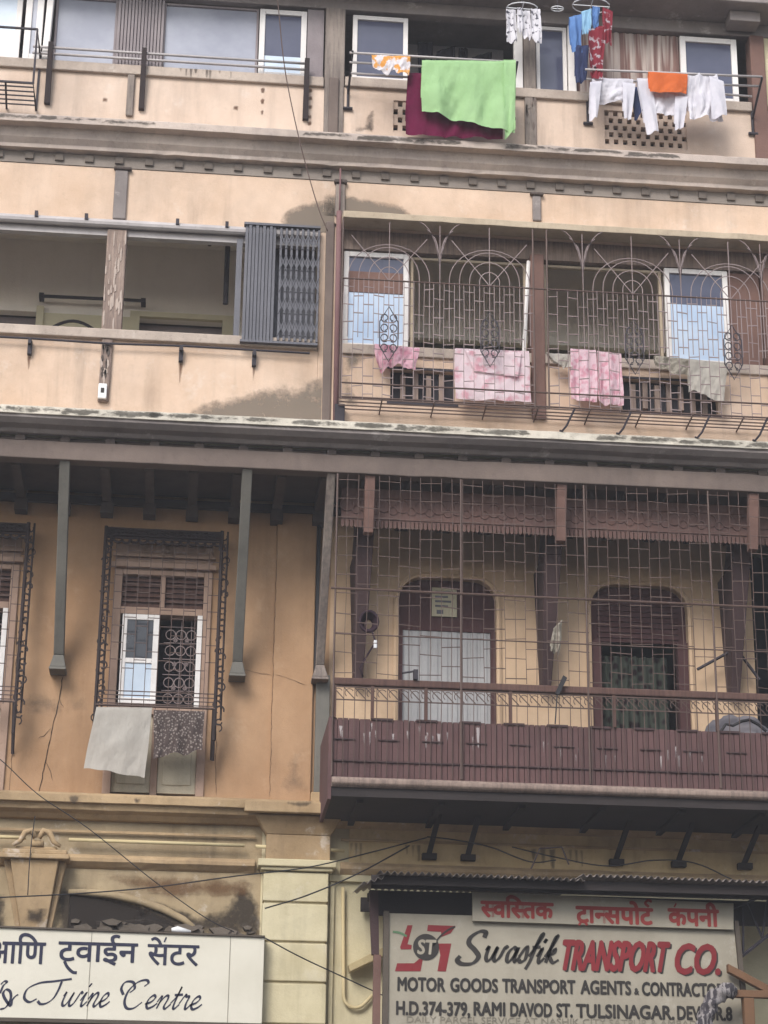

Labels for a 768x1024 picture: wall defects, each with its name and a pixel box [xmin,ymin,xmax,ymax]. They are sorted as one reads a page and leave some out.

leakage [286,197,405,233]
peeling [103,231,126,329]
leakage [0,406,98,415]
leakage [112,382,335,425]
leakage [355,422,452,431]
leakage [135,880,246,894]